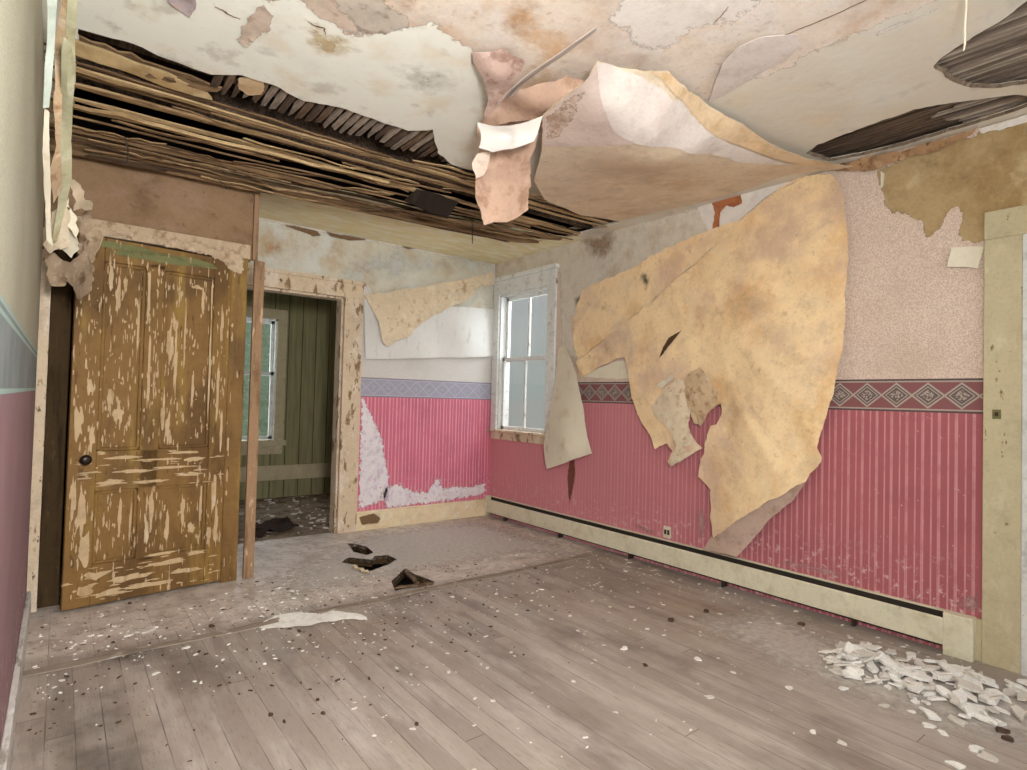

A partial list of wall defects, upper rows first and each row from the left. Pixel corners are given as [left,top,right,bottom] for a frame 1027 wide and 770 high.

peeling [168,0,196,18]
peeling [237,0,276,47]
spalling [806,1,1027,172]
peeling [698,182,789,231]
peeling [286,225,365,241]
peeling [61,224,244,600]
peeling [357,398,486,525]